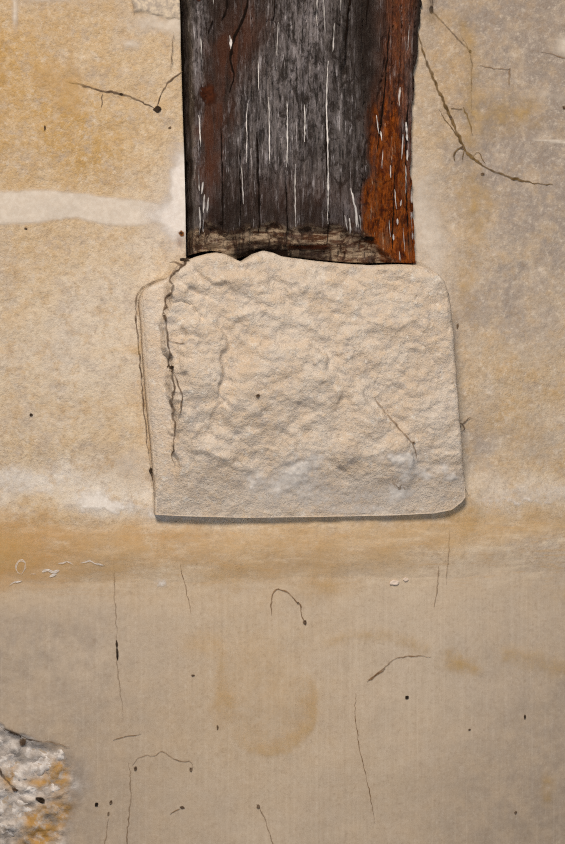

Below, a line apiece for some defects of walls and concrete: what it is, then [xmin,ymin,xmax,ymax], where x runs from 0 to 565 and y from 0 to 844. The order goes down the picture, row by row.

crack [69,32,183,113]
crack [418,34,553,185]
crack [135,258,190,480]
damp [0,554,102,585]
crack [270,589,306,626]
crack [368,655,426,681]
spalling [0,724,80,844]